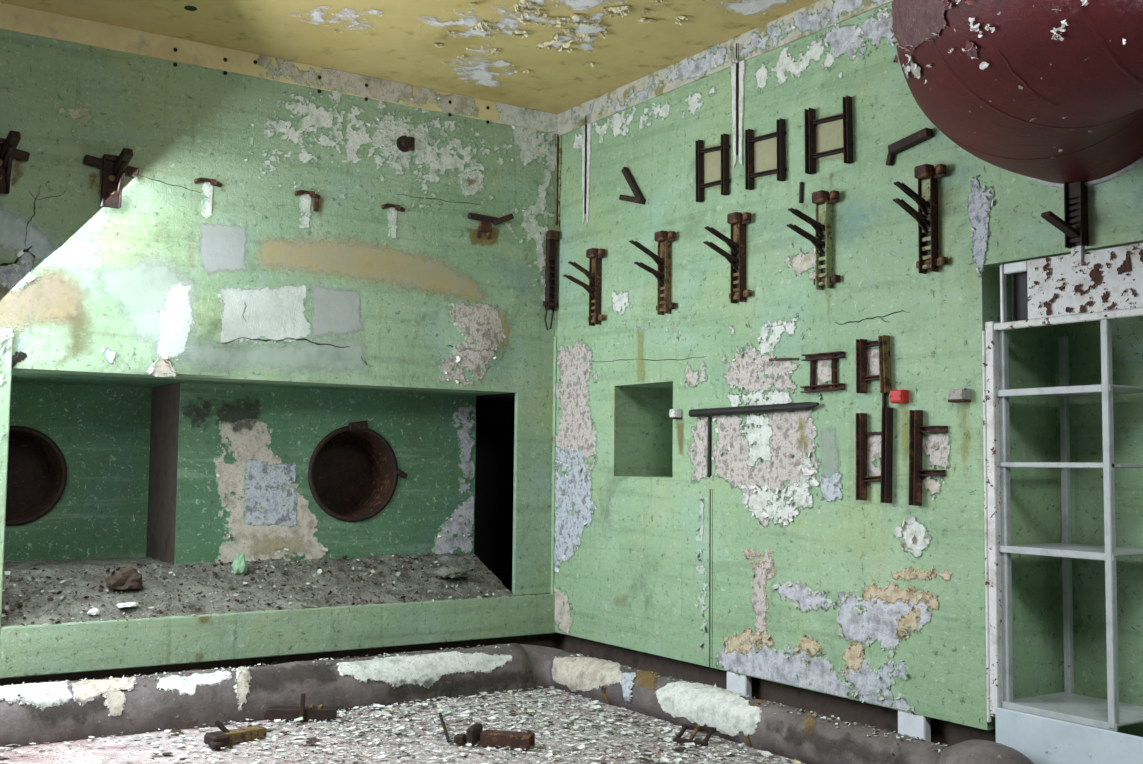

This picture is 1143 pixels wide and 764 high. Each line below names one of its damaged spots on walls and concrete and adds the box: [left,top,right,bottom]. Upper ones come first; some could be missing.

peeling [1051,9,1068,41]
peeling [225,0,996,310]
crack [0,185,62,273]
peeling [0,329,25,387]
spalling [438,302,506,389]
peeling [212,419,328,563]
peeling [431,401,476,555]
peeling [552,335,599,633]
peeling [611,290,952,715]
peeling [0,675,137,717]
peeling [157,666,252,711]
peeling [654,681,762,737]